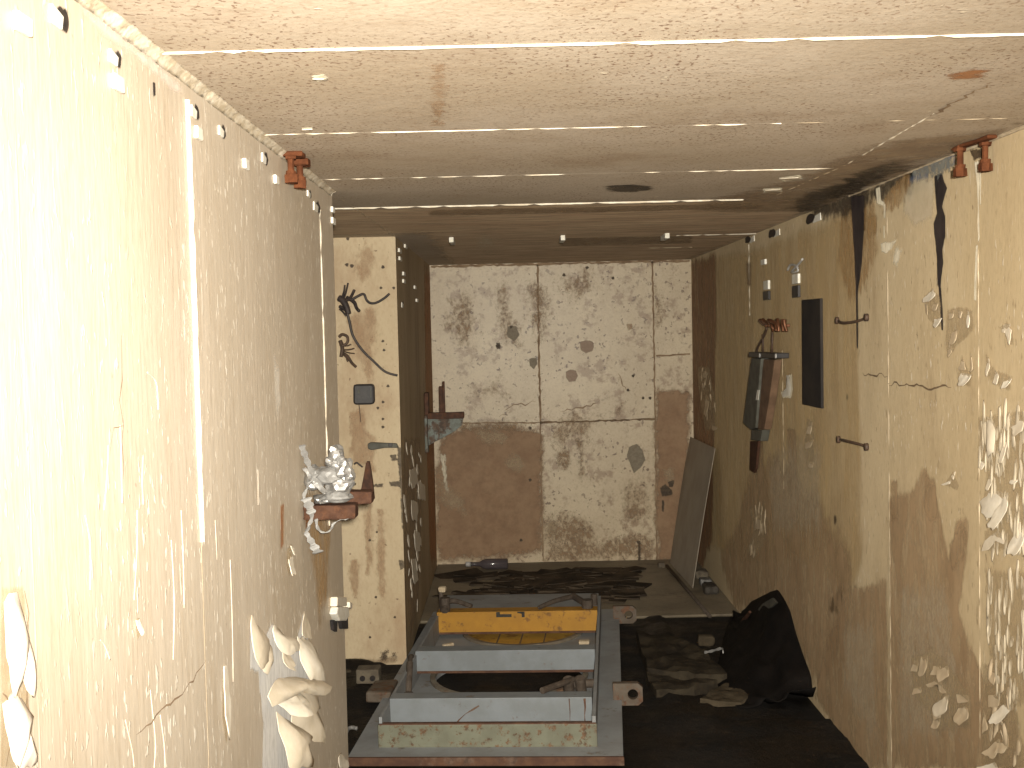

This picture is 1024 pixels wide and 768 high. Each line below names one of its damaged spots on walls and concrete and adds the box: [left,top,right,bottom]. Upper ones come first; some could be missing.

crack [930,85,988,116]
corrosion [948,70,990,79]
peeling [374,439,426,635]
leakage [333,133,1017,768]
crack [862,372,951,398]
peeling [923,288,1024,768]
peeling [2,592,37,768]
crack [138,662,205,734]
peeling [250,611,332,768]
peeling [910,649,970,729]